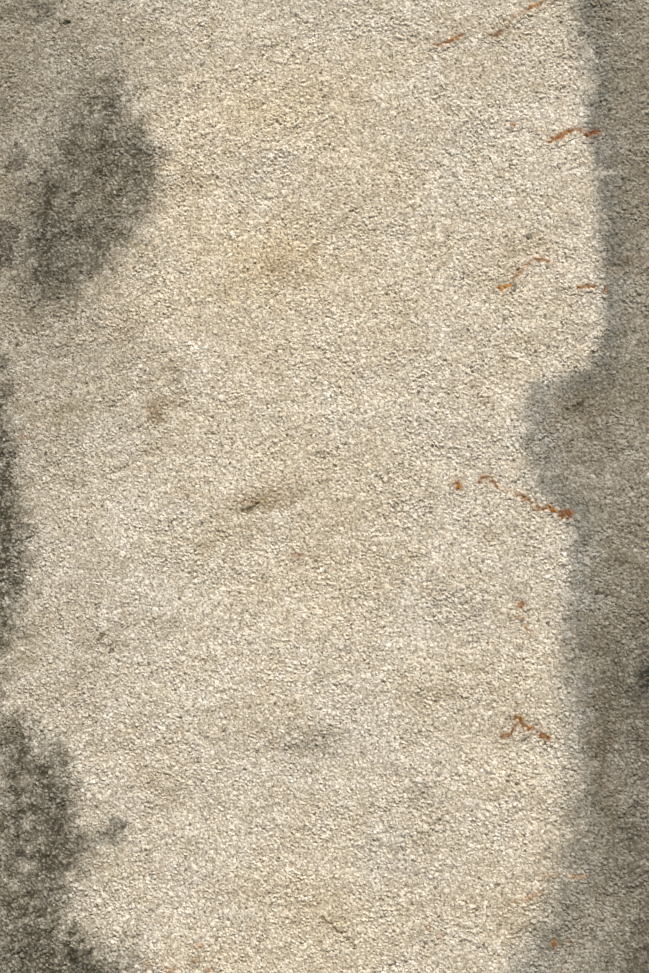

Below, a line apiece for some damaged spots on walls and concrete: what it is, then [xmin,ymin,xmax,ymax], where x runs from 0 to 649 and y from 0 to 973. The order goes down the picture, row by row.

rust [428,29,470,52]
rust [481,0,570,44]
rust [504,115,607,149]
rust [490,252,615,298]
leakage [0,0,200,973]
rust [448,469,578,525]
rust [494,709,557,747]